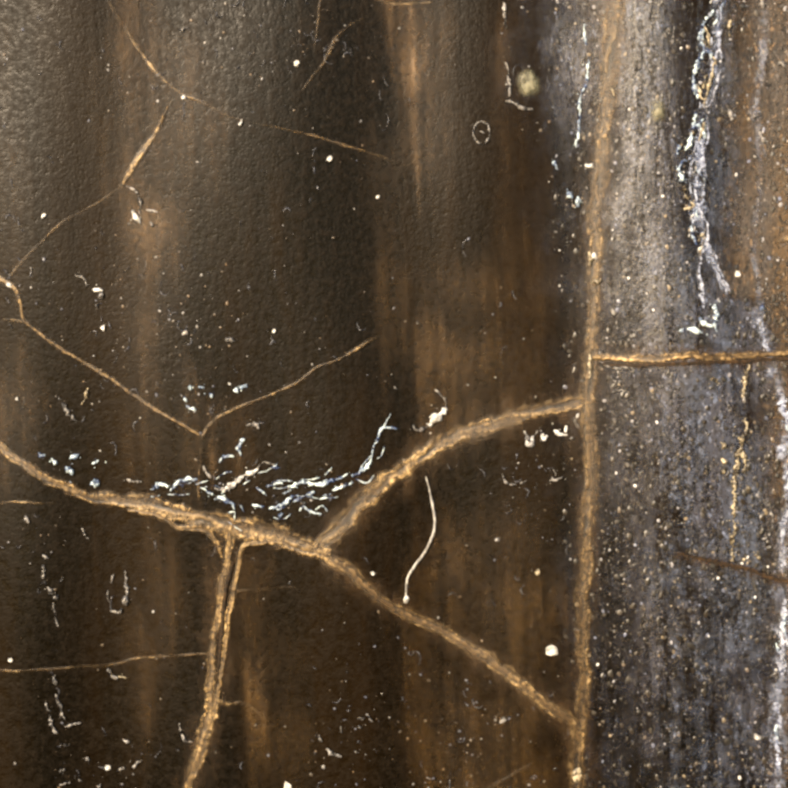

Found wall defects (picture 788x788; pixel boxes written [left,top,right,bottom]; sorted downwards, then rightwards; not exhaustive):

crack [122,113,165,185]
crack [133,42,199,101]
water stain [546,0,611,99]
crack [0,277,366,436]
crack [570,0,788,788]
water stain [598,0,788,788]
crack [0,395,589,788]